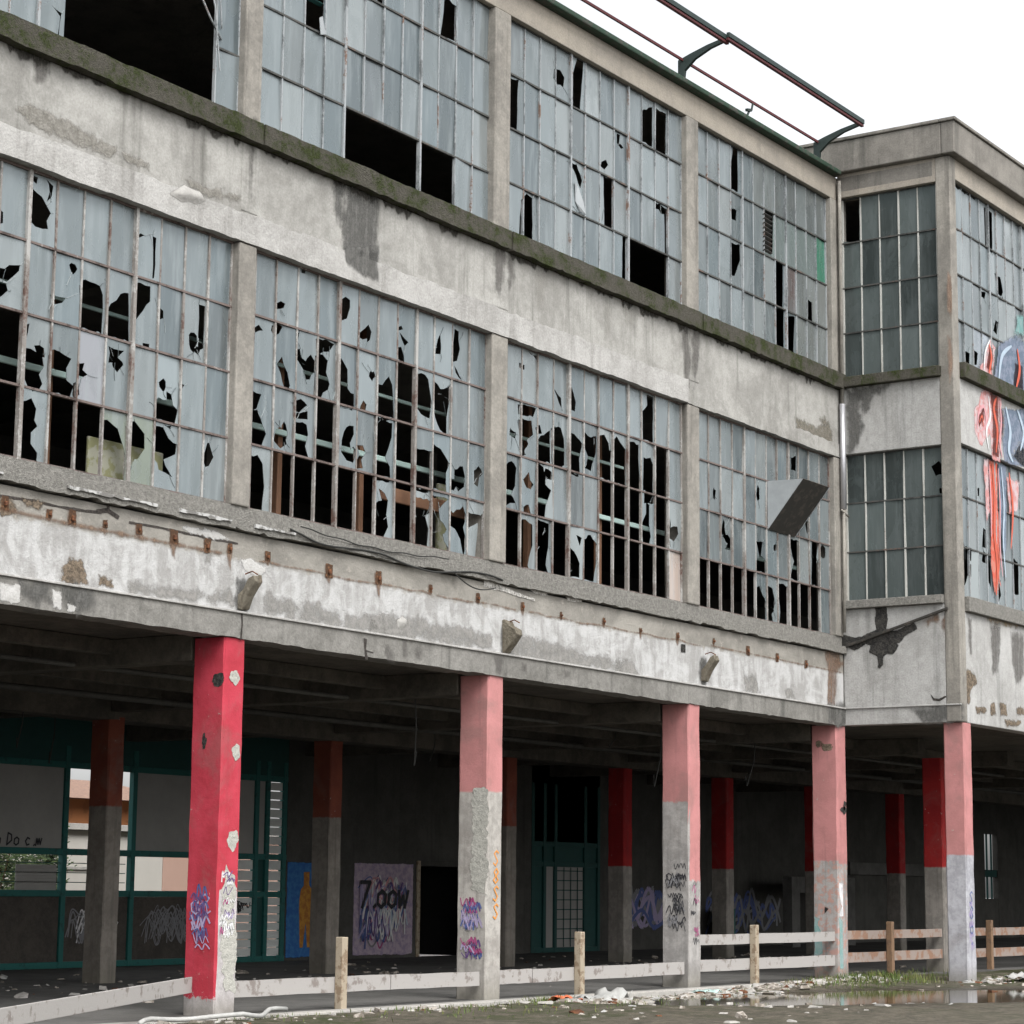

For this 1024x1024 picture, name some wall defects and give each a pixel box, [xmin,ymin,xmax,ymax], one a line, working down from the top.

water stain [309,169,825,385]
rust [0,495,233,567]
spalling [52,557,114,612]
rust [261,551,566,619]
rust [579,618,694,645]
spalling [842,607,917,669]
peeling [212,670,240,687]
spalling [966,669,1024,727]
peeling [232,744,240,761]
peeling [227,830,239,852]
peeling [470,787,489,896]
peeling [220,865,237,994]